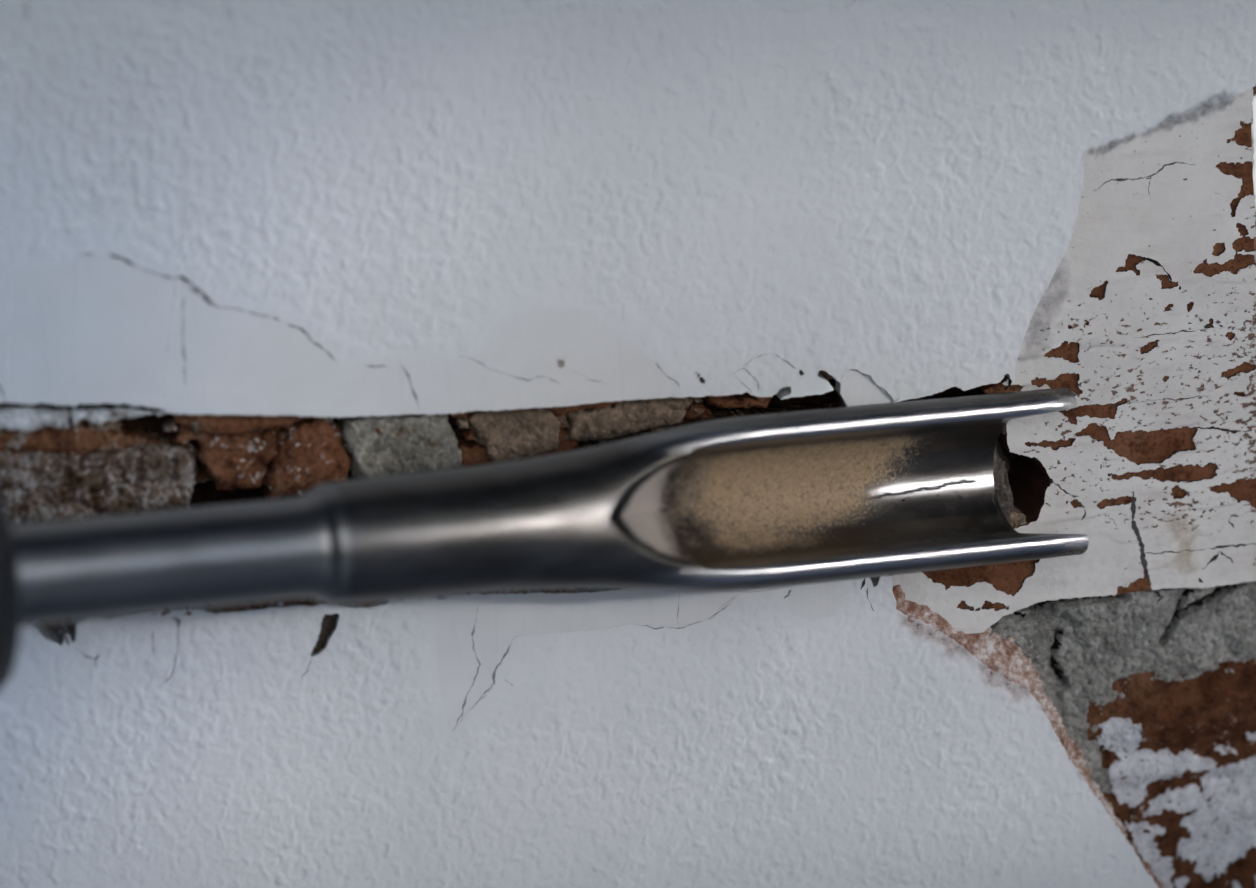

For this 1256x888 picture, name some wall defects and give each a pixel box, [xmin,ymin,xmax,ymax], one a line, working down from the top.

peeling [1193,121,1255,276]
crack [0,253,336,428]
crack [366,364,420,408]
crack [731,354,796,395]
peeling [835,370,892,407]
peeling [936,322,1256,508]
peeling [1089,254,1145,300]
peeling [1156,274,1180,289]
crack [1050,480,1256,635]
crack [455,605,515,727]
crack [1013,595,1121,682]
spalling [892,559,1256,888]